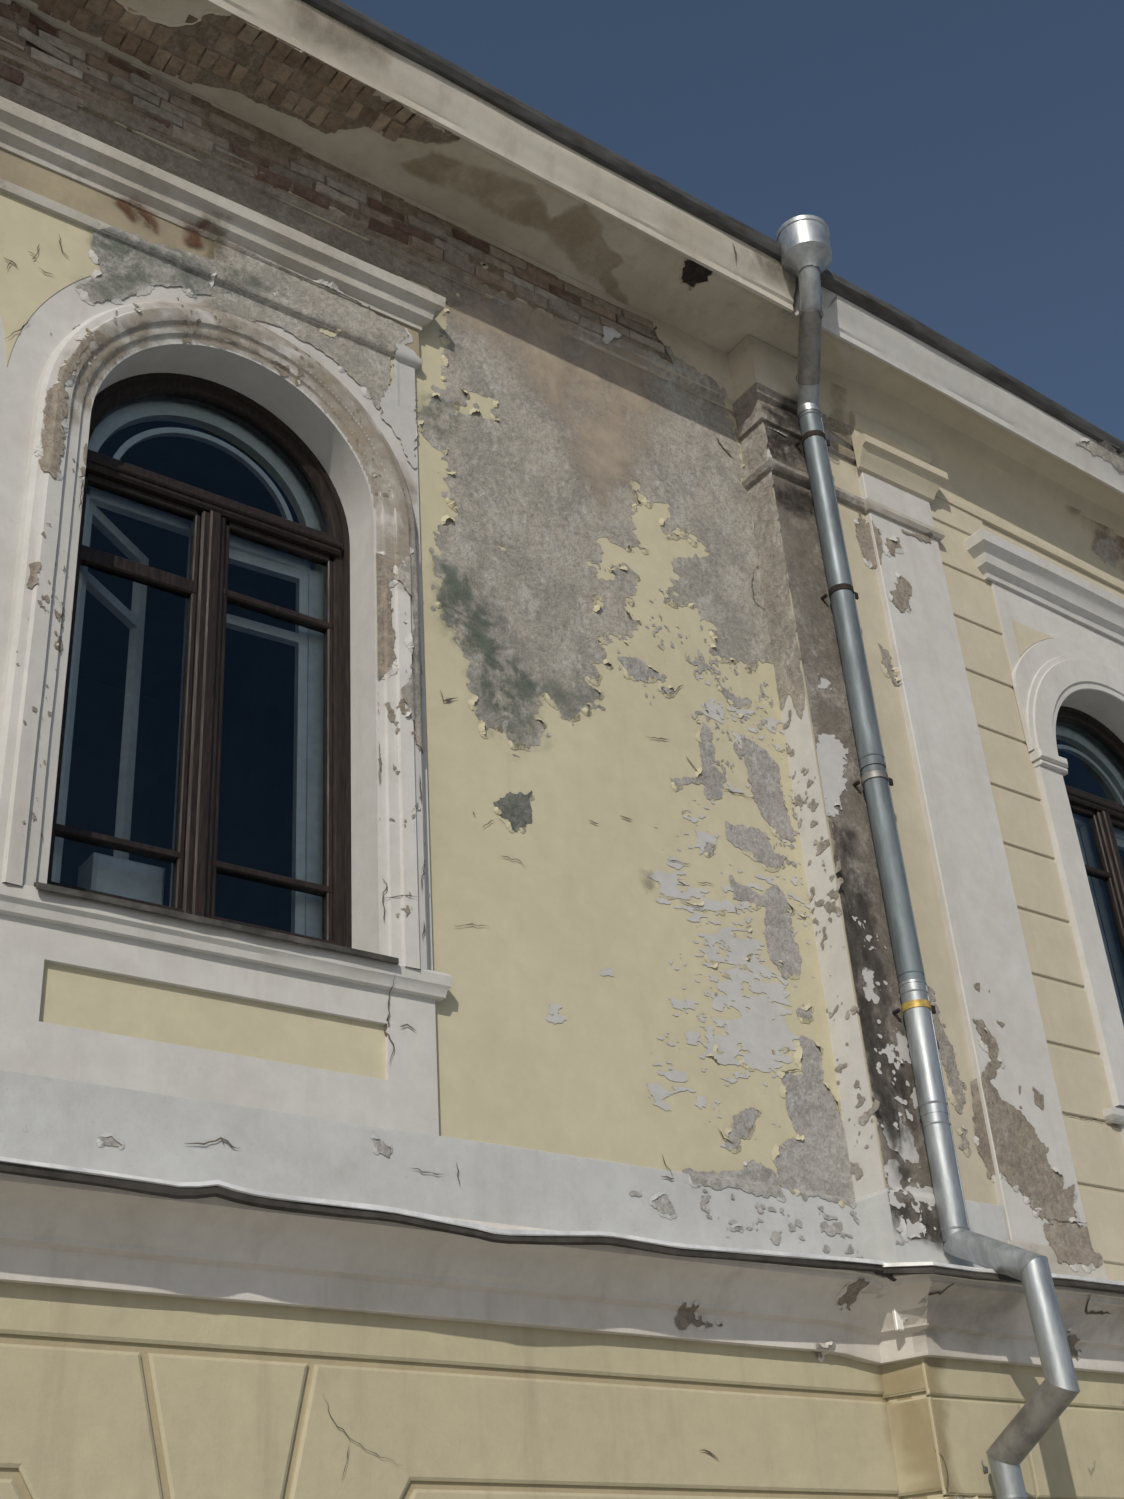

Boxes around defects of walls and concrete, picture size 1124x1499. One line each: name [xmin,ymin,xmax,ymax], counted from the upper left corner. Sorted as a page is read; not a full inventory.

peeling [1076,437,1124,472]
leakage [763,398,841,677]
flaking render [1092,529,1124,569]
peeling [0,0,942,1259]
crack [384,974,416,1061]
leakage [831,777,941,1242]
crack [185,1137,236,1148]
peeling [927,985,1103,1273]
crack [323,1395,403,1480]